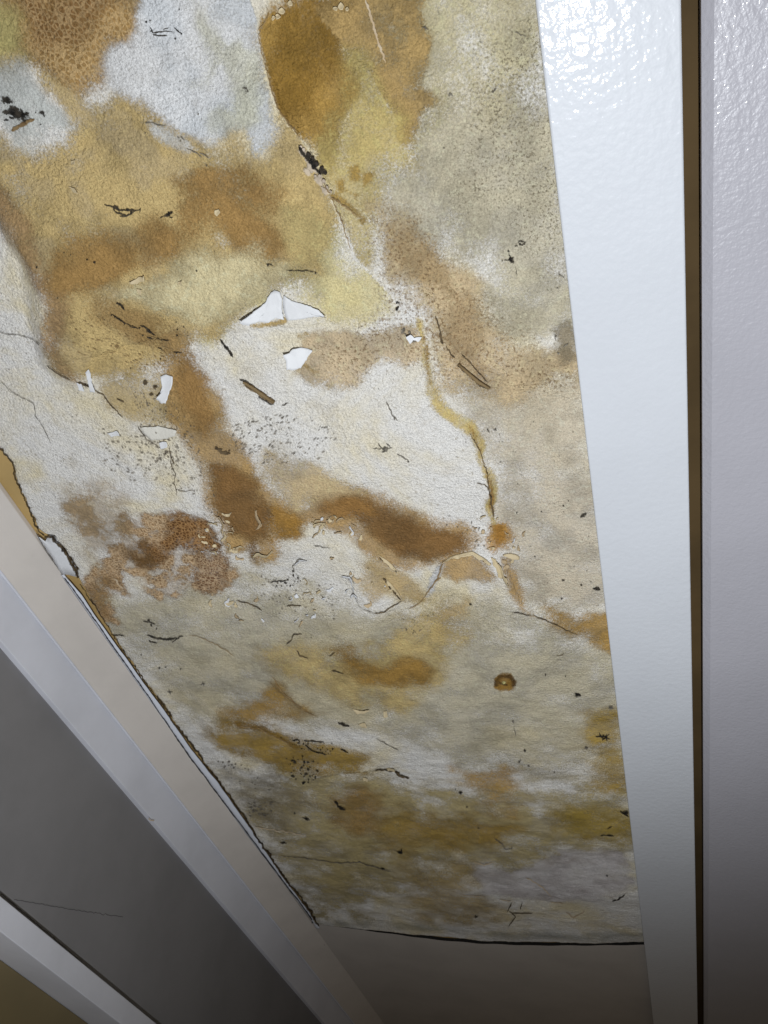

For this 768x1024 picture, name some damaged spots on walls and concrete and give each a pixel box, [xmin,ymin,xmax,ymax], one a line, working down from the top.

peeling [239,290,326,326]
peeling [283,347,312,371]
crack [435,316,489,383]
peeling [50,317,273,561]
damp [0,0,633,926]
crack [471,436,494,520]
crack [366,558,454,614]
rust [494,673,516,691]